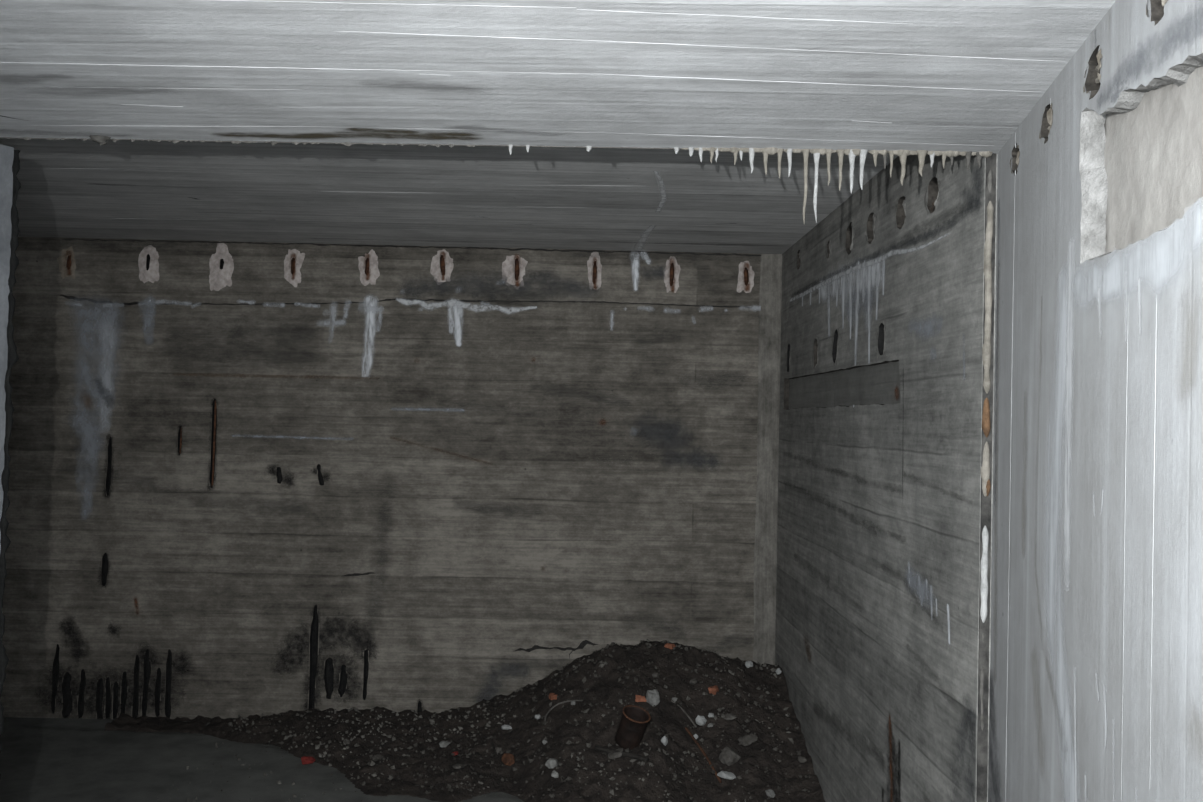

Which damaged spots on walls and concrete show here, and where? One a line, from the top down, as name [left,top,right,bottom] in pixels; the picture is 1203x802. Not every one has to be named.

hole [1150,0,1164,25]
water stain [682,147,992,212]
spalling [1041,104,1050,144]
spalling [1079,45,1203,264]
efflorescence [363,297,381,374]
water stain [397,275,590,346]
water stain [790,221,954,364]
crack [515,640,598,659]
corrosion [882,716,901,802]